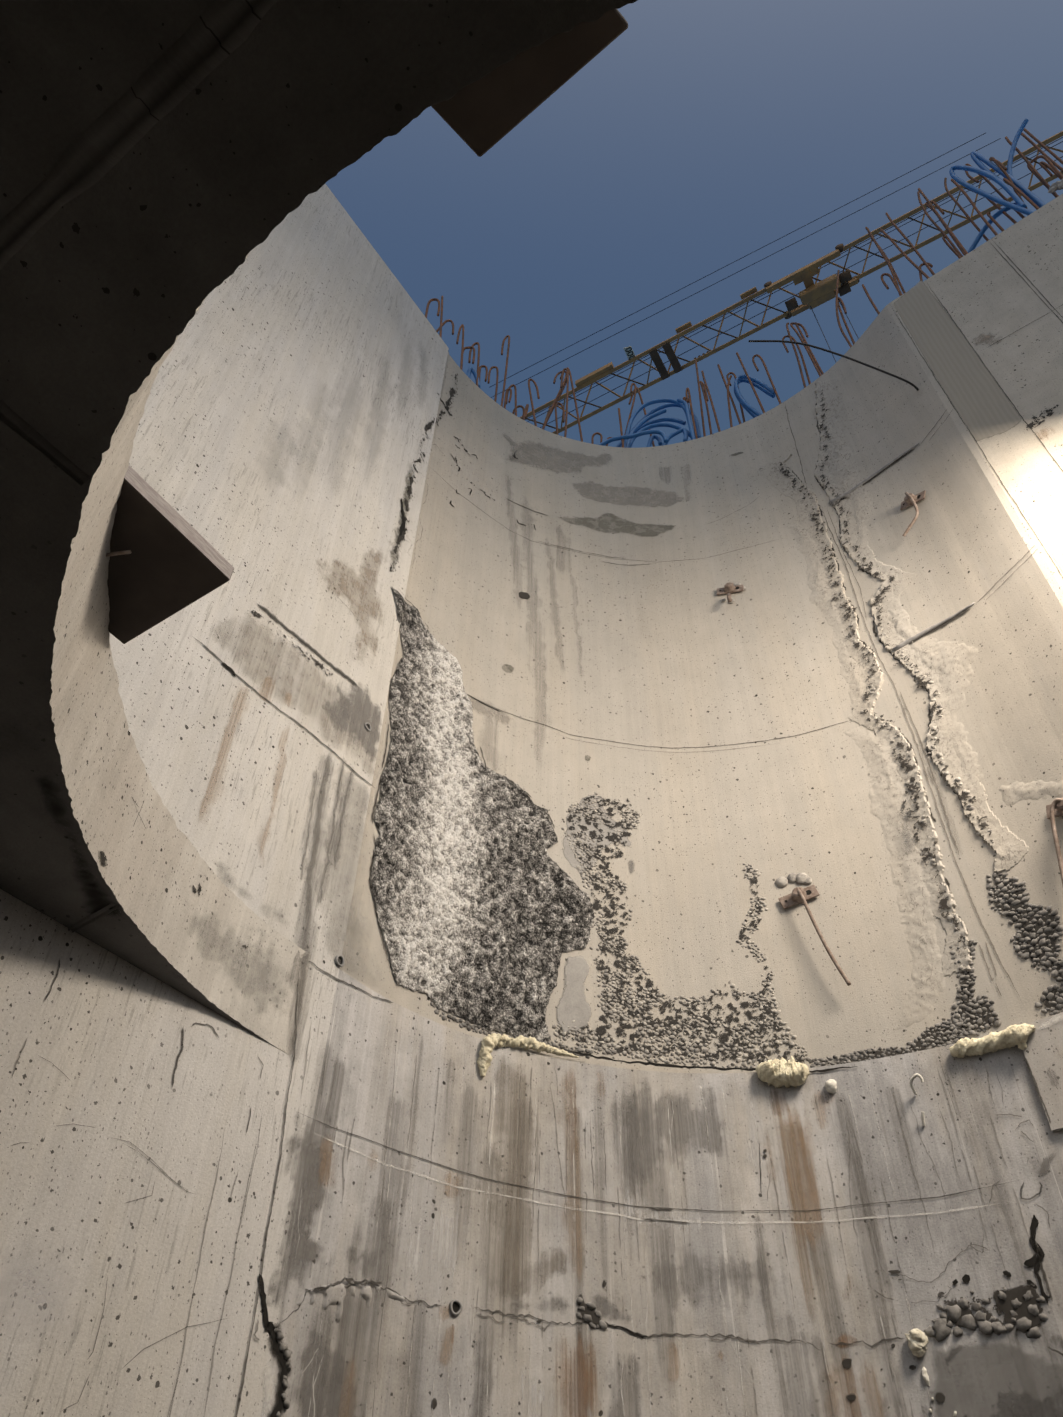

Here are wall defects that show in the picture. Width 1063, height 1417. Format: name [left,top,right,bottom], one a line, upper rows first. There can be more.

spalling [779,322,994,942]
spalling [369,587,595,1042]
damp [618,1087,726,1180]
damp [273,1135,333,1302]
damp [300,1327,367,1417]
damp [492,1066,536,1296]
crack [254,1274,904,1417]
spalling [822,1359,856,1401]
crack [876,1236,987,1303]
spalling [924,1271,1063,1356]
crack [1024,1215,1052,1304]